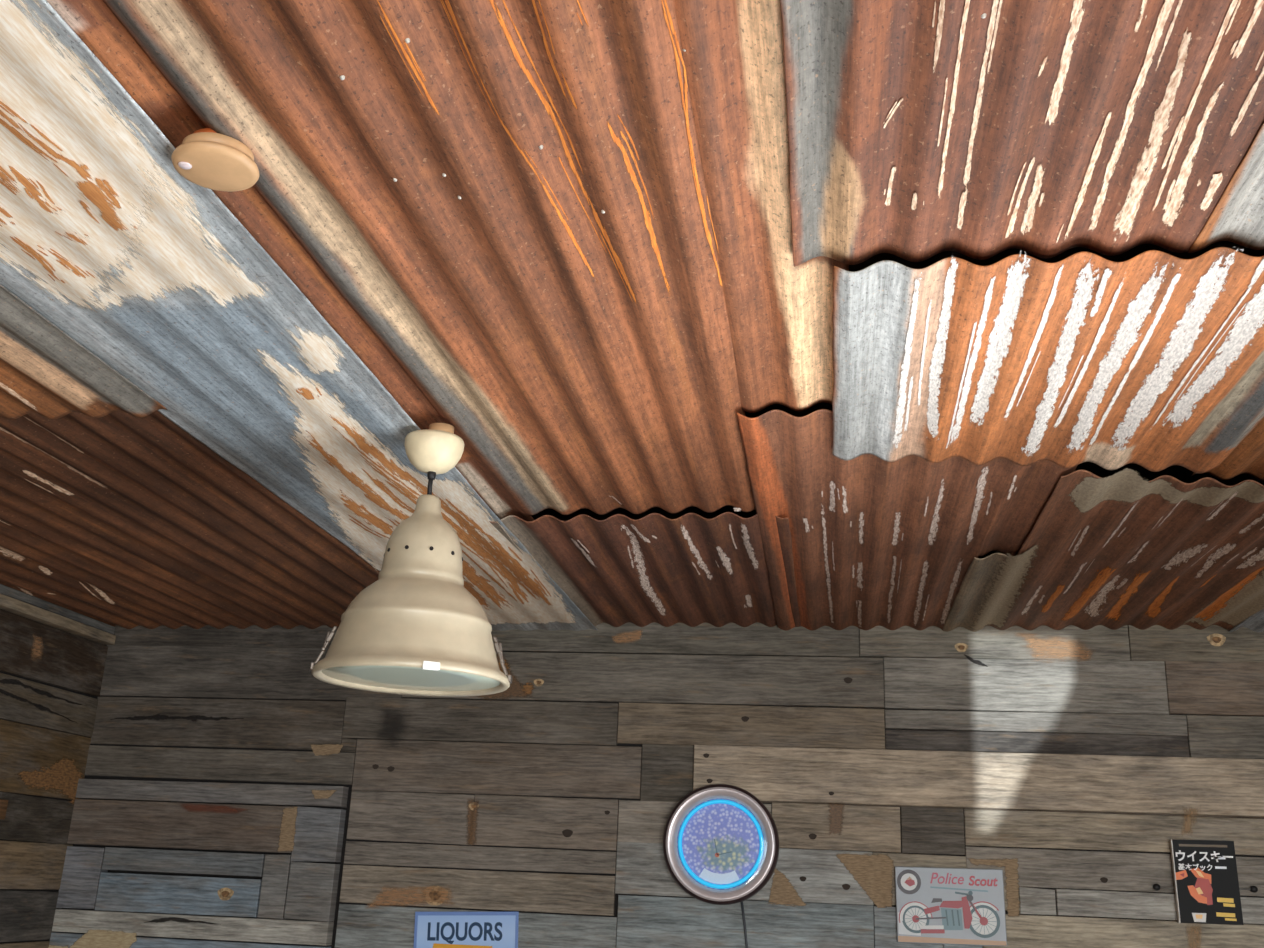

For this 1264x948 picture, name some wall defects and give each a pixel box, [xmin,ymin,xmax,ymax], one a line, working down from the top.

rust [0,207,95,283]
rust [0,101,137,231]
peeling [0,0,270,312]
rust [489,0,637,304]
rust [608,114,672,298]
peeling [892,251,1030,449]
peeling [957,0,1003,230]
peeling [1004,249,1264,459]
peeling [1056,0,1264,242]
peeling [257,326,576,625]
rust [305,414,553,609]
rust [1067,468,1264,513]